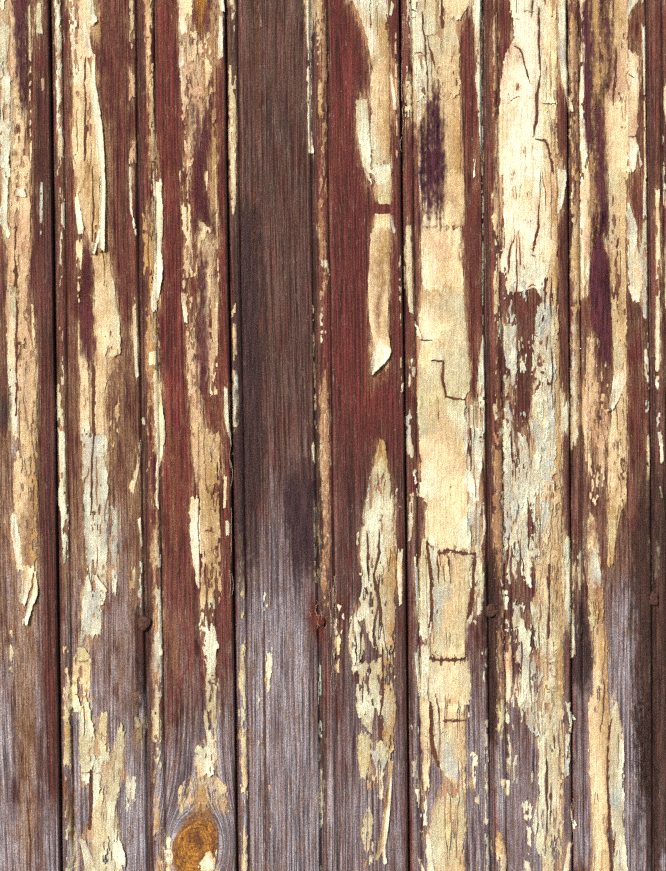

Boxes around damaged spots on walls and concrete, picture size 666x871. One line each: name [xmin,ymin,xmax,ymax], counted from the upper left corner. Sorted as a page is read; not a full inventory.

peeling [307,0,328,154]
peeling [0,0,45,625]
peeling [178,0,245,819]
crack [421,340,466,401]
peeling [312,0,666,871]
corrosion [135,603,153,707]
peeling [238,639,248,803]
peeling [257,641,273,709]
peeling [153,797,173,871]